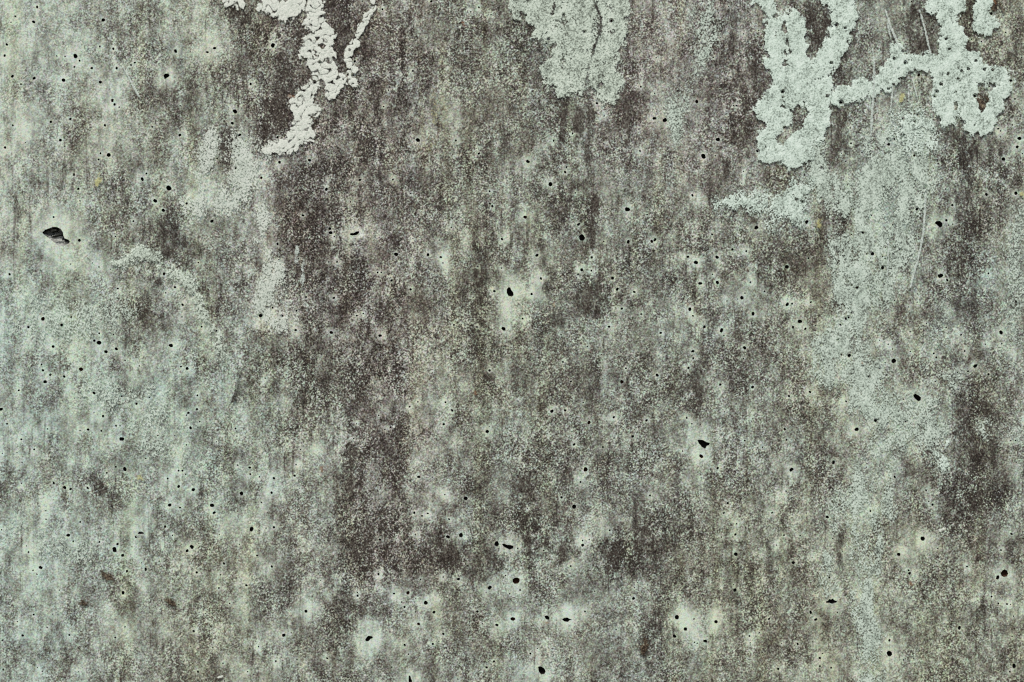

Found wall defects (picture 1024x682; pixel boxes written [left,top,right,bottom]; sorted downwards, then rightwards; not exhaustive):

water stain [508,0,633,182]
water stain [7,0,417,408]
water stain [590,194,600,248]
water stain [524,244,606,328]
water stain [653,0,1024,682]
water stain [75,372,200,467]
water stain [4,501,97,570]
water stain [634,605,675,671]